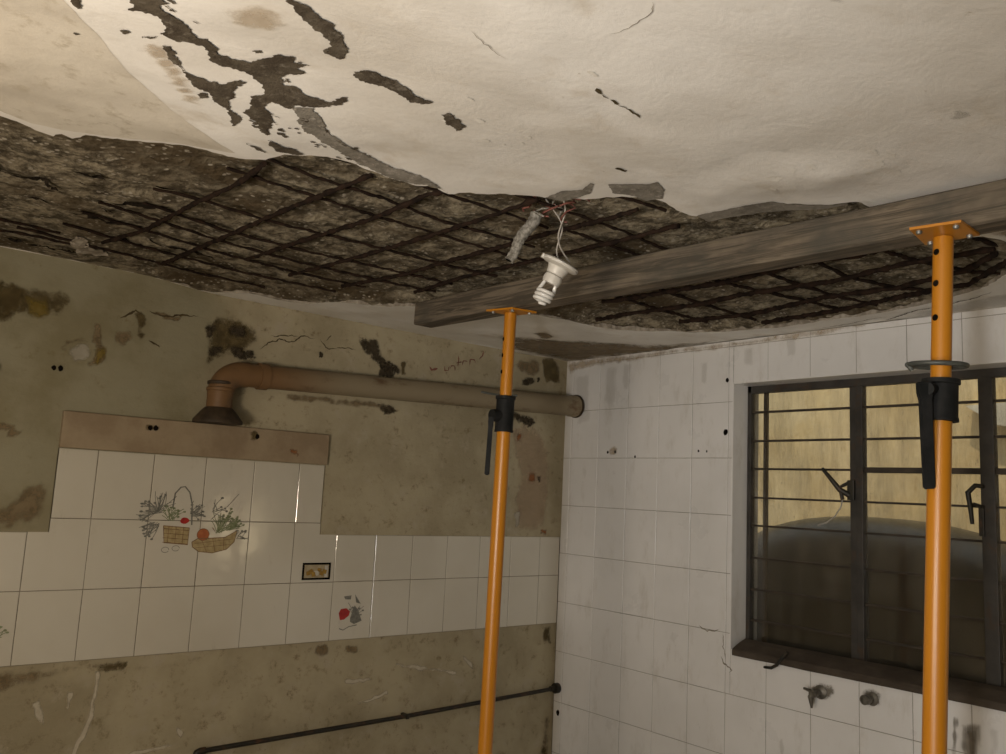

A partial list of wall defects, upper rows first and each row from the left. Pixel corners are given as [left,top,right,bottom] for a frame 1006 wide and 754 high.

crack [595,88,640,118]
spalling [0,0,868,305]
spalling [534,244,933,332]
spalling [953,237,1006,292]
peeling [205,318,255,362]
water stain [953,720,977,754]